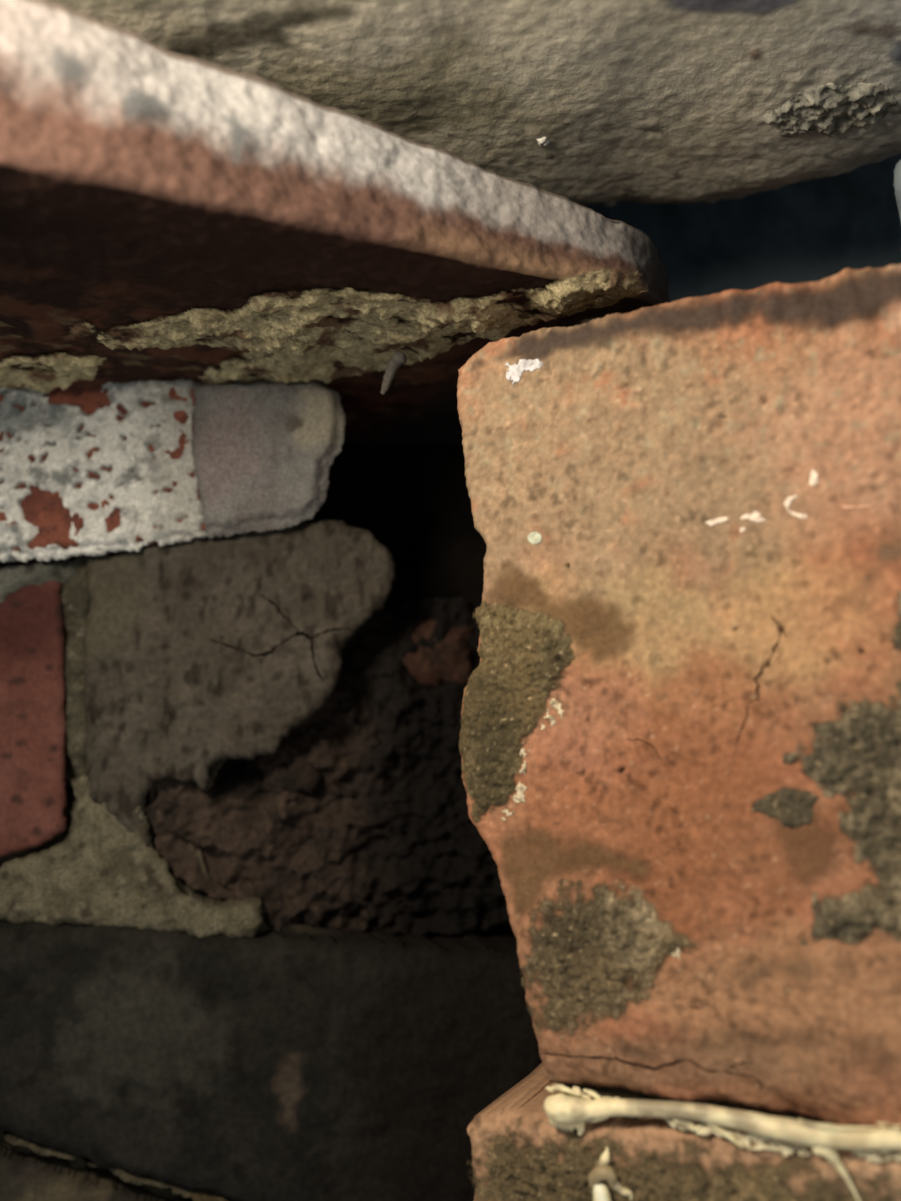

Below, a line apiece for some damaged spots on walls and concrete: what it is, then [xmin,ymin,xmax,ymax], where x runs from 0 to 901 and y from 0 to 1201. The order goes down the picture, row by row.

leakage [670,0,798,14]
leakage [854,23,901,65]
spalling [763,82,898,138]
peeling [0,322,207,563]
crack [735,615,786,746]
leakage [541,698,564,730]
crack [541,1053,762,1090]